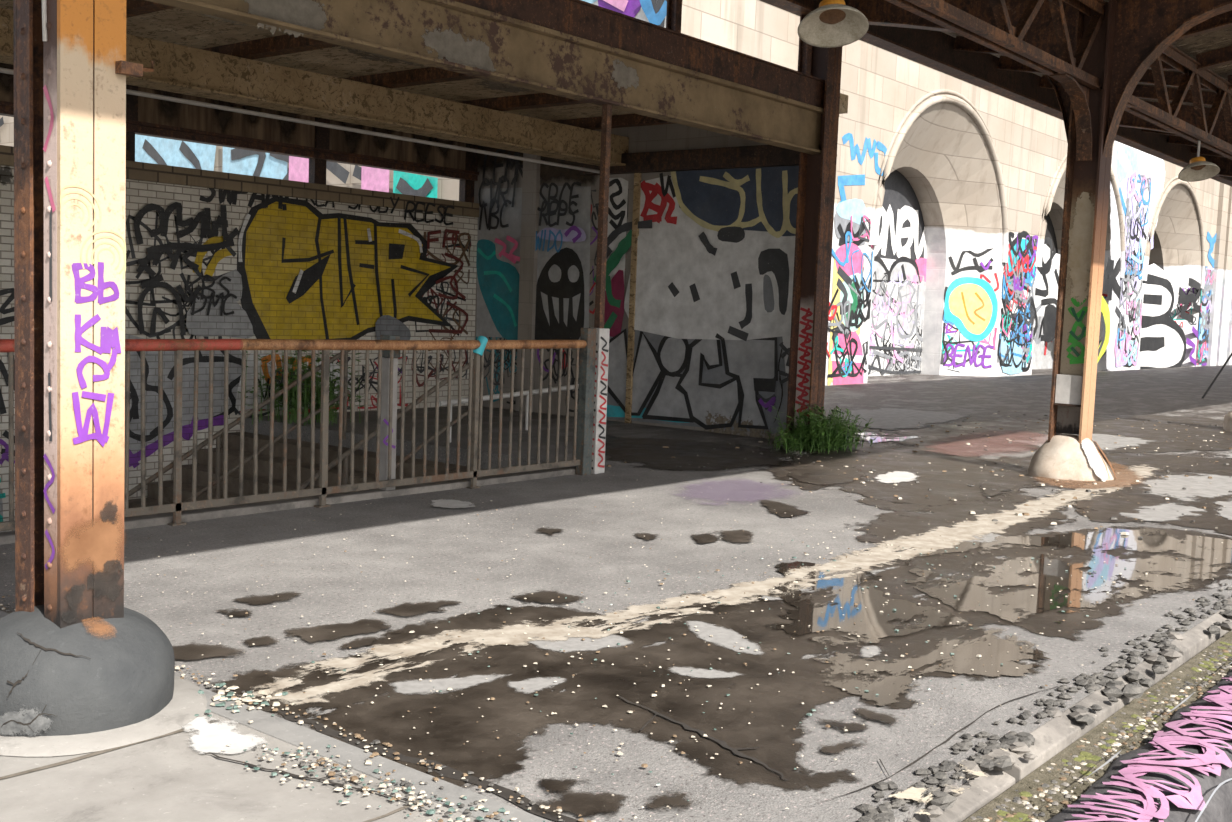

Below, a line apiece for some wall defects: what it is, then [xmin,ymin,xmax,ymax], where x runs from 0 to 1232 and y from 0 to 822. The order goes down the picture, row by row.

peeling [245,0,327,38]
leakage [0,63,14,91]
peeling [335,27,535,93]
corrosion [63,518,122,573]
crack [1,632,91,731]
spalling [0,705,53,737]